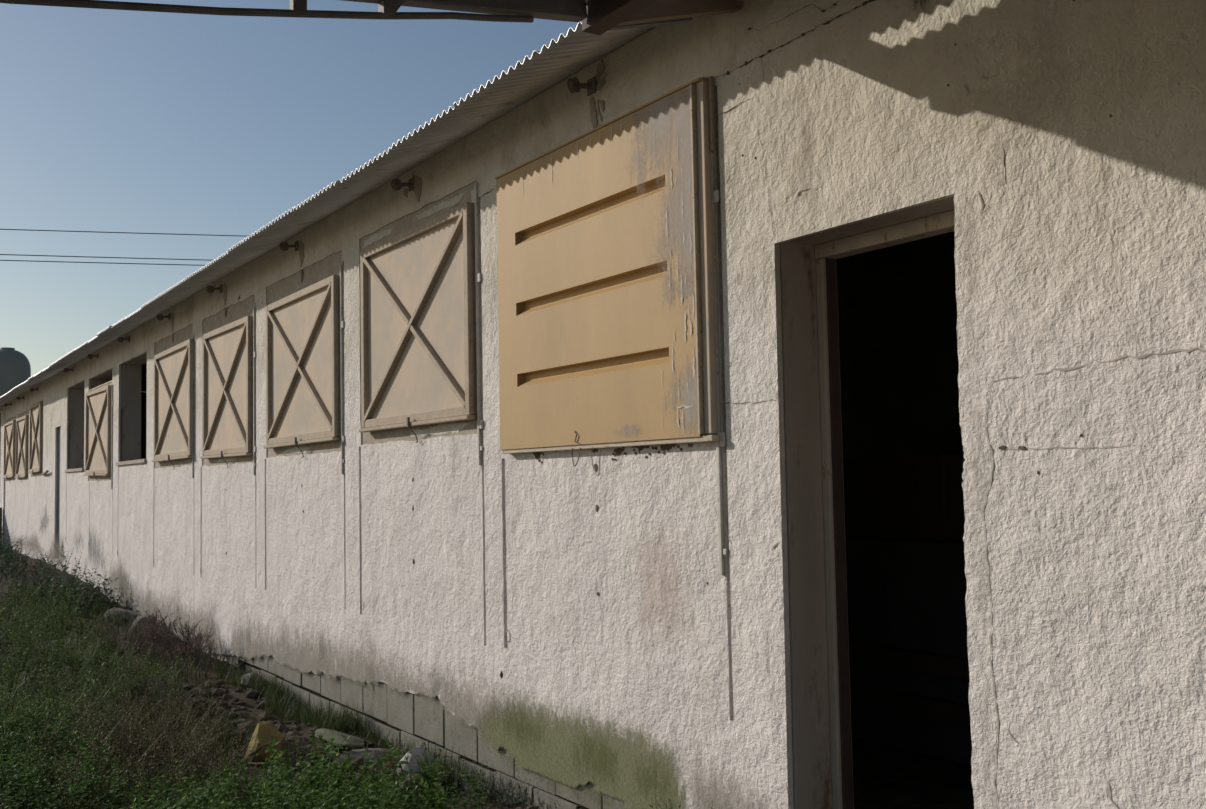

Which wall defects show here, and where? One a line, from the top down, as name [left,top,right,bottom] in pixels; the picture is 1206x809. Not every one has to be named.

crack [714,0,875,118]
peeling [592,86,698,472]
water stain [9,513,534,748]
crack [982,348,1206,809]